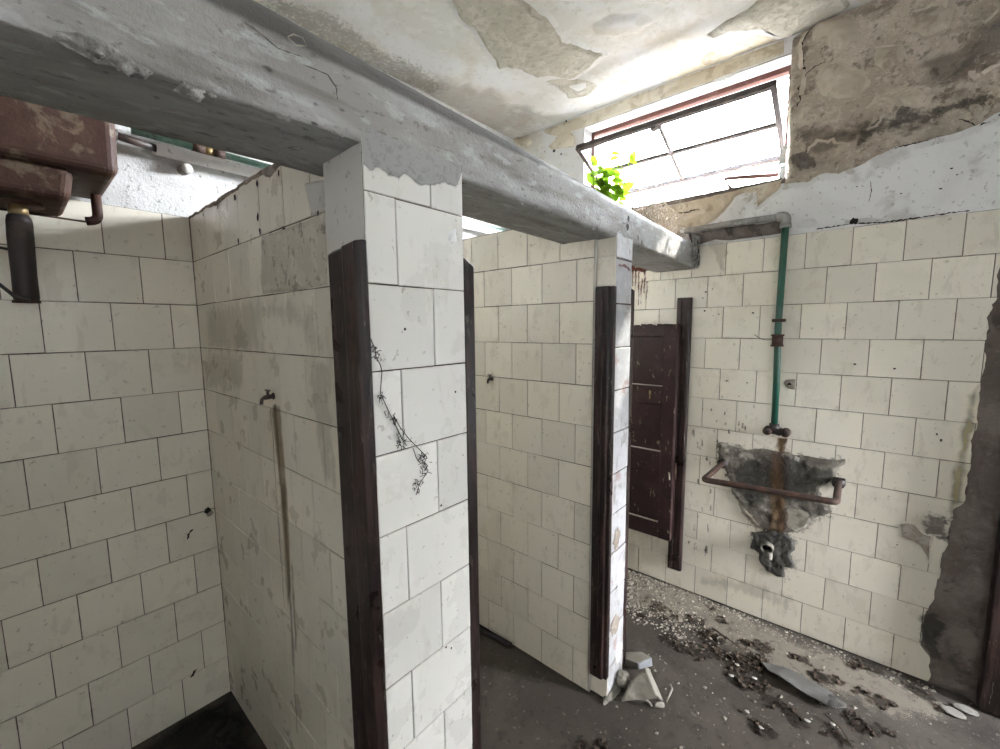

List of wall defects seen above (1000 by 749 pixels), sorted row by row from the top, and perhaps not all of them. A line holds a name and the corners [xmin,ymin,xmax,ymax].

spalling [52,31,153,80]
spalling [172,81,218,102]
peeling [446,0,612,99]
peeling [513,0,859,183]
damp [777,0,1000,190]
corrosion [619,264,648,305]
damp [273,407,290,600]
corrosion [770,438,787,532]
peeling [716,442,845,577]
peeling [896,268,1000,719]